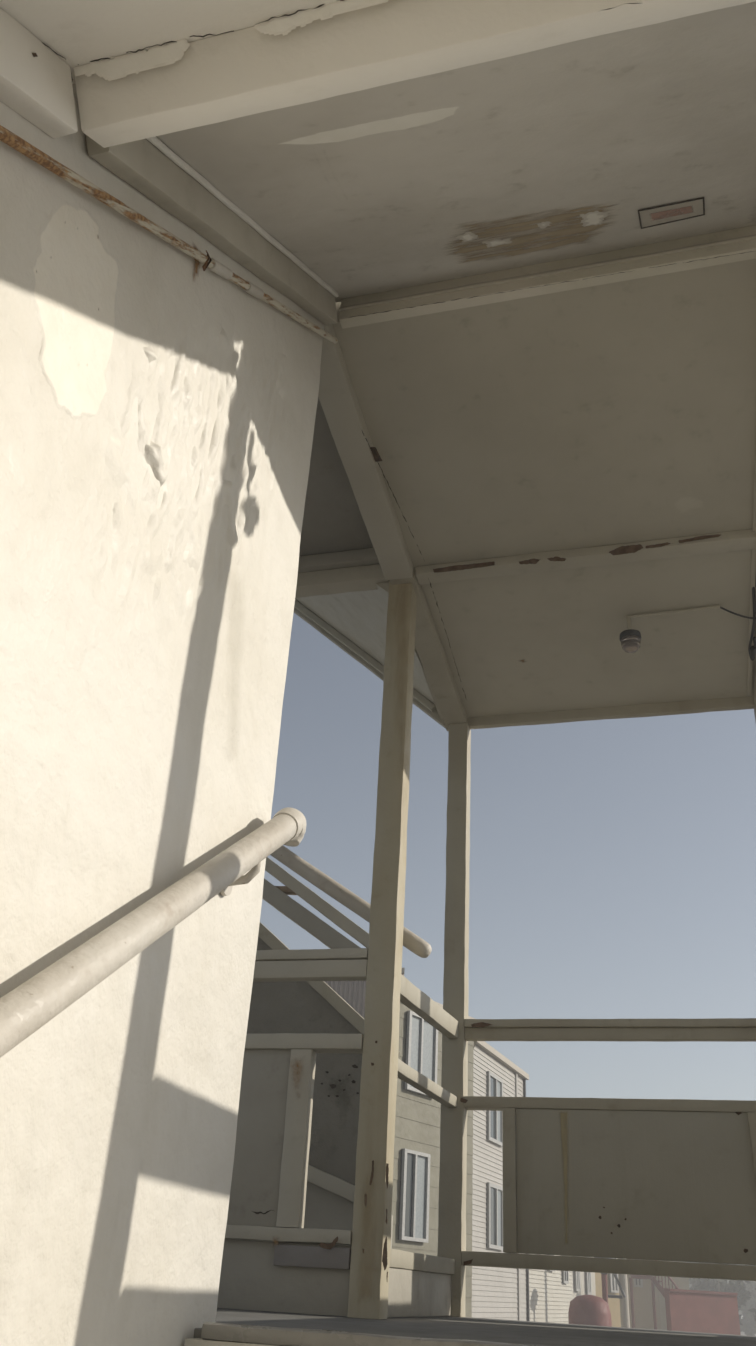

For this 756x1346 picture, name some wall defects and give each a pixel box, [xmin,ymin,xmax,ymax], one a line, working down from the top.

peeling [254,0,388,36]
peeling [74,39,190,81]
flaking render [28,201,120,420]
peeling [609,534,721,555]
peeling [433,561,495,573]